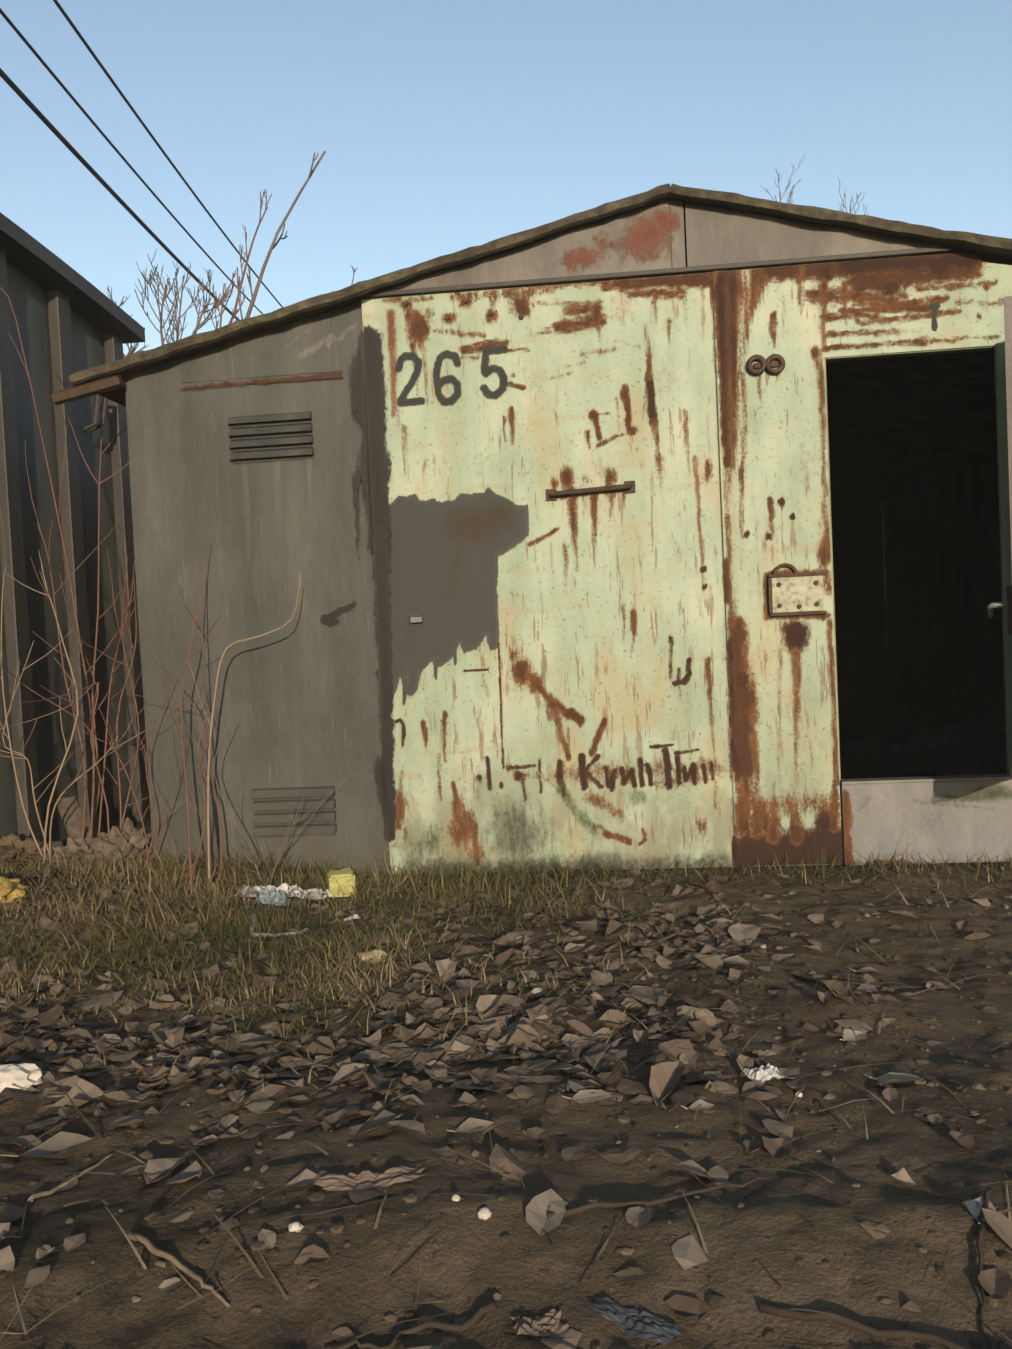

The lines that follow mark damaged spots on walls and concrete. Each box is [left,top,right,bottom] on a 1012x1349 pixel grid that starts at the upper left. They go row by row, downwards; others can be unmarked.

rust [383,252,1004,867]